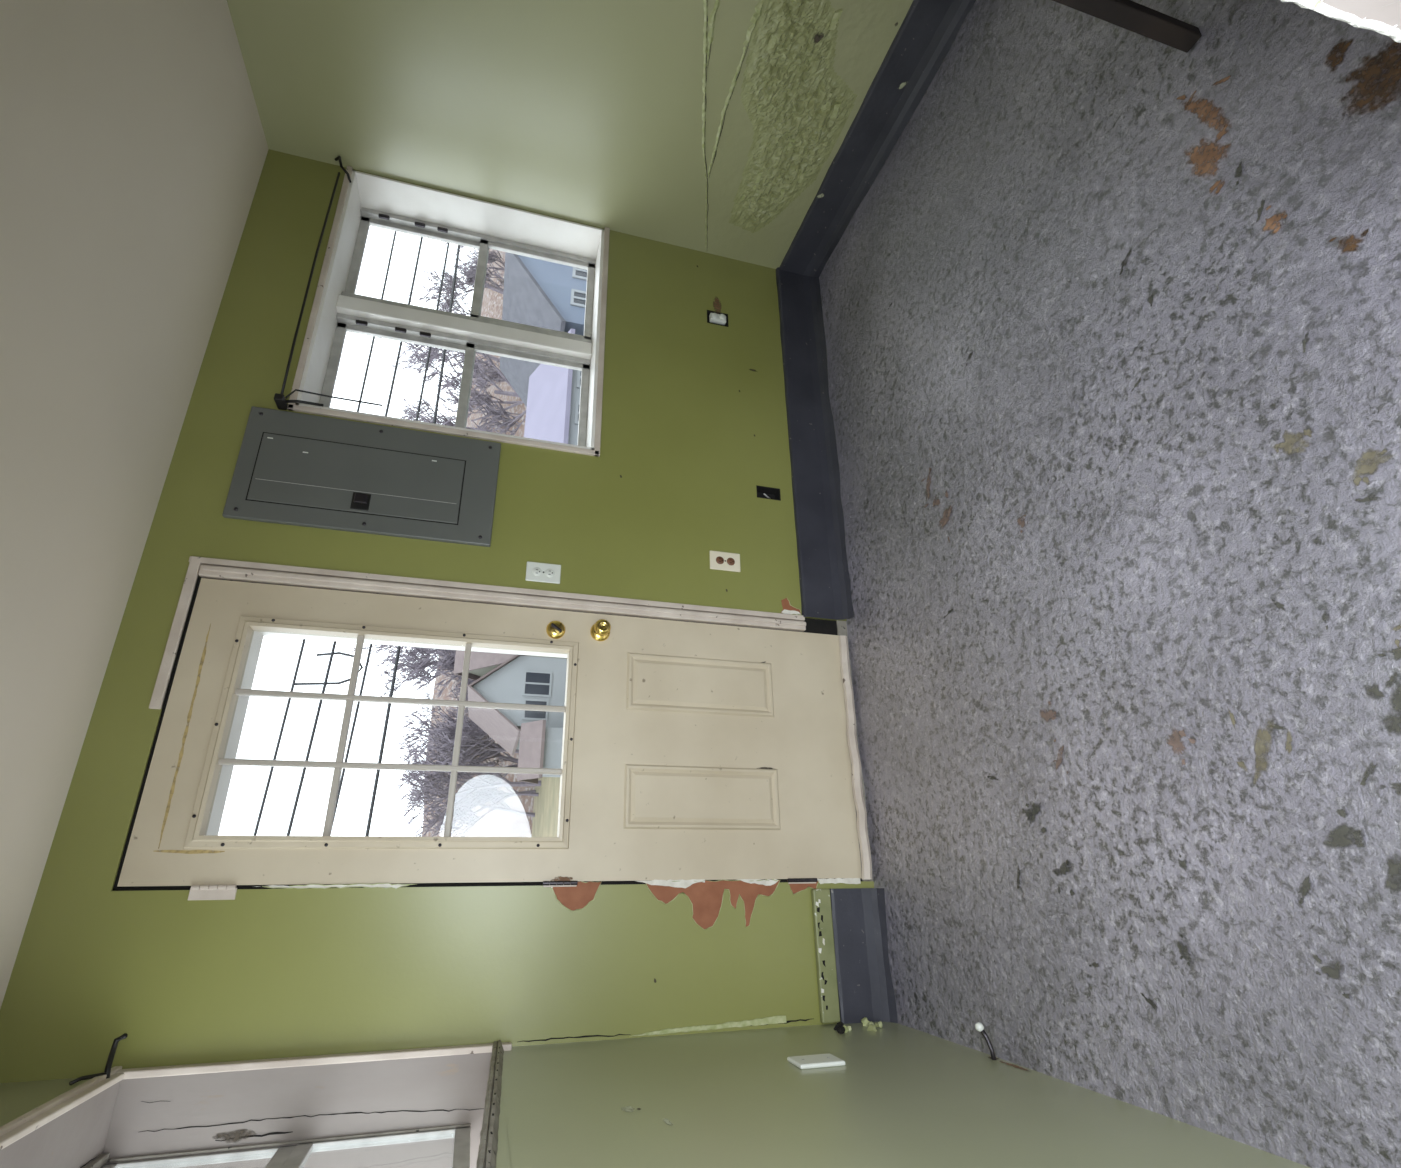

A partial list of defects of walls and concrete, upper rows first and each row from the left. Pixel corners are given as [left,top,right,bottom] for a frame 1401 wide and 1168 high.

crack [702,0,749,248]
peeling [551,881,602,912]
peeling [637,878,882,1034]